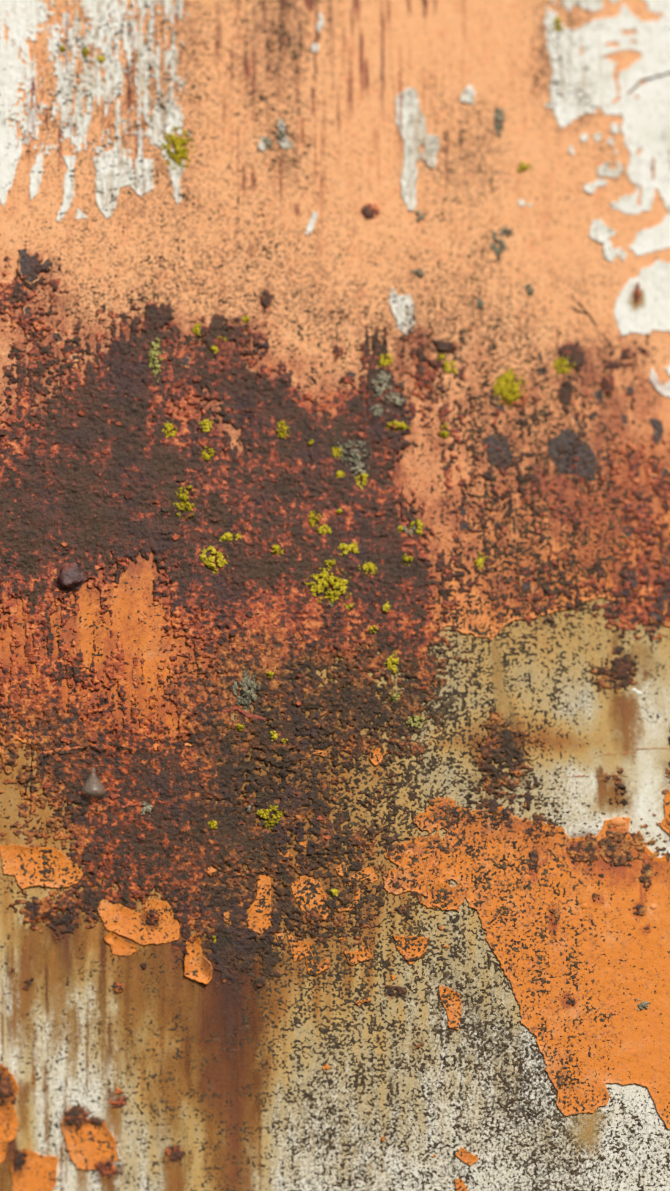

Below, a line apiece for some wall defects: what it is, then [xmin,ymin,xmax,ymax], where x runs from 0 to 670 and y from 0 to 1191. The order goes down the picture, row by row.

peeling [0,0,190,222]
rust [361,203,379,219]
peeling [395,87,440,211]
peeling [543,0,670,336]
peeling [650,364,670,397]
rust [0,246,670,1191]
peeling [420,664,670,858]
peeling [0,845,83,919]
peeling [0,898,213,1191]
peeling [246,904,670,1191]